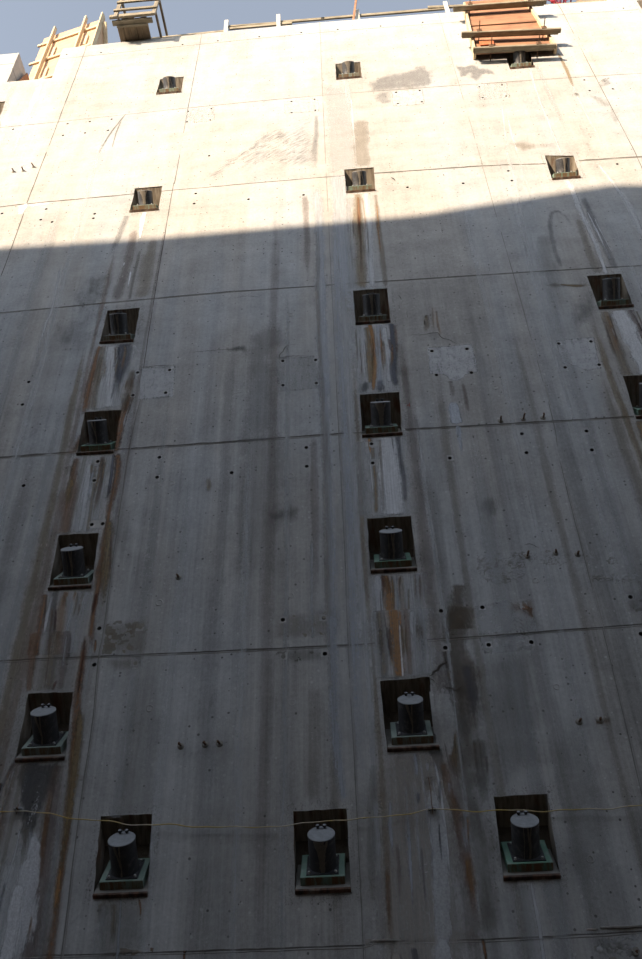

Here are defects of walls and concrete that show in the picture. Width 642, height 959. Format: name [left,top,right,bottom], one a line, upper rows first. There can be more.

leakage [376,71,429,88]
corrosion [346,189,380,286]
corrosion [355,320,398,393]
corrosion [15,339,136,959]
corrosion [371,567,424,676]
corrosion [92,891,148,899]